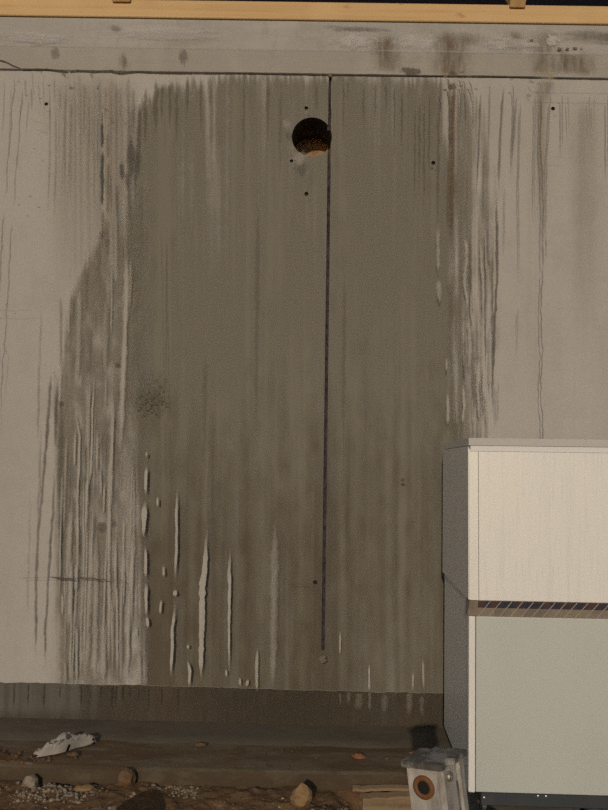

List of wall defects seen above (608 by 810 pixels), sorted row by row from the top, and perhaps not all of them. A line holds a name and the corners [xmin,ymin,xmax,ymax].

damp [35,68,498,727]
damp [499,88,516,168]